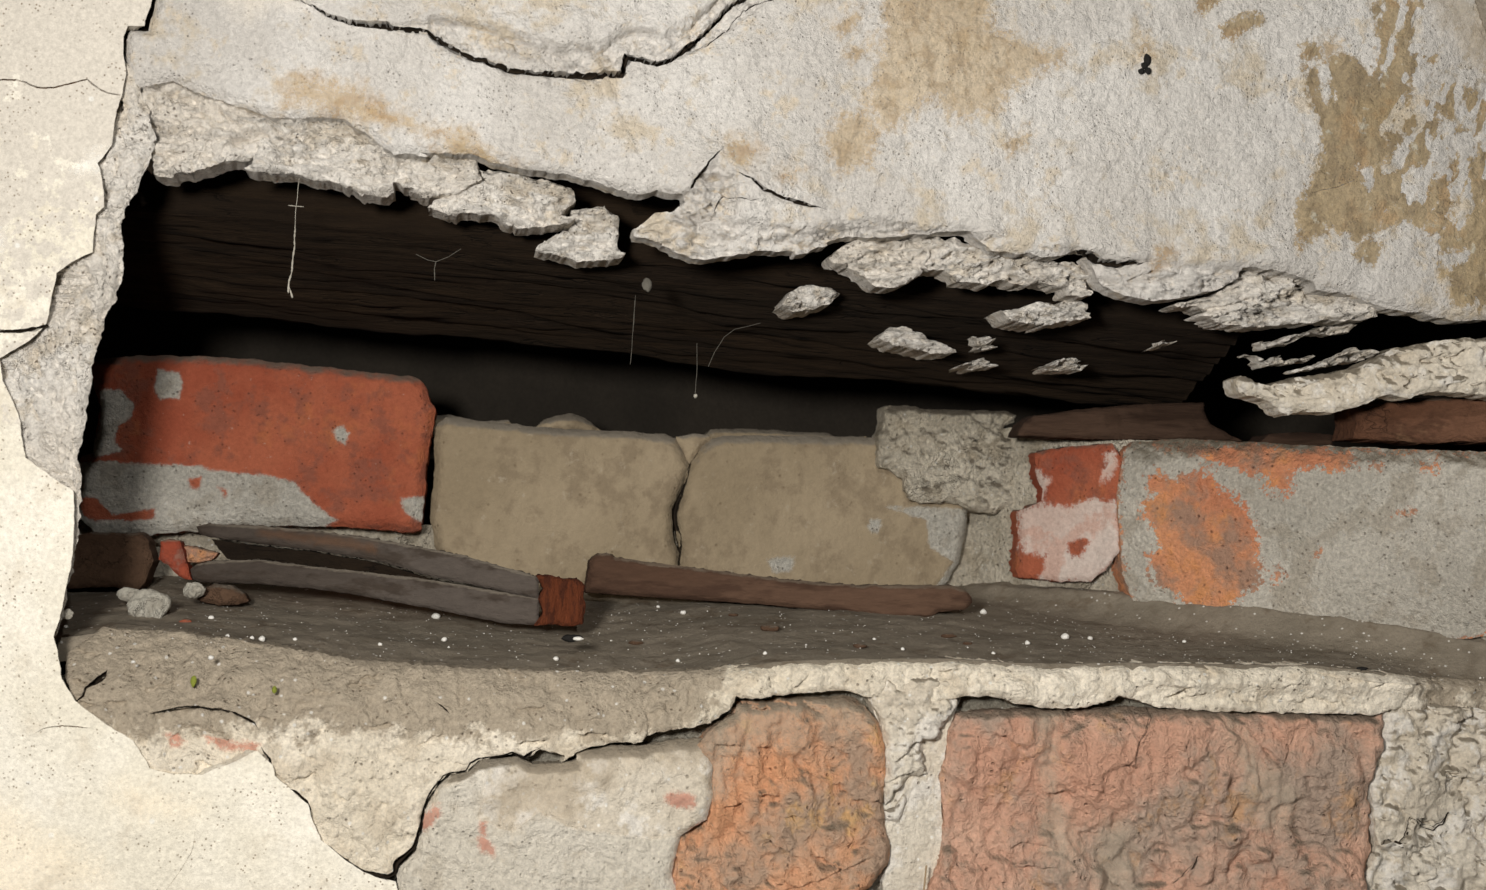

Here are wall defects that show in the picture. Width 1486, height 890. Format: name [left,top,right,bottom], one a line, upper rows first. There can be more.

crack [124,0,156,61]
crack [300,0,772,80]
damp [1435,0,1486,66]
crack [0,79,124,112]
peeling [1291,0,1486,315]
crack [0,324,49,333]
flaking render [0,61,626,637]
peeling [772,236,1093,375]
peeling [1143,340,1177,352]
peeling [1159,271,1378,370]
spalling [674,433,712,464]
spalling [884,793,906,823]